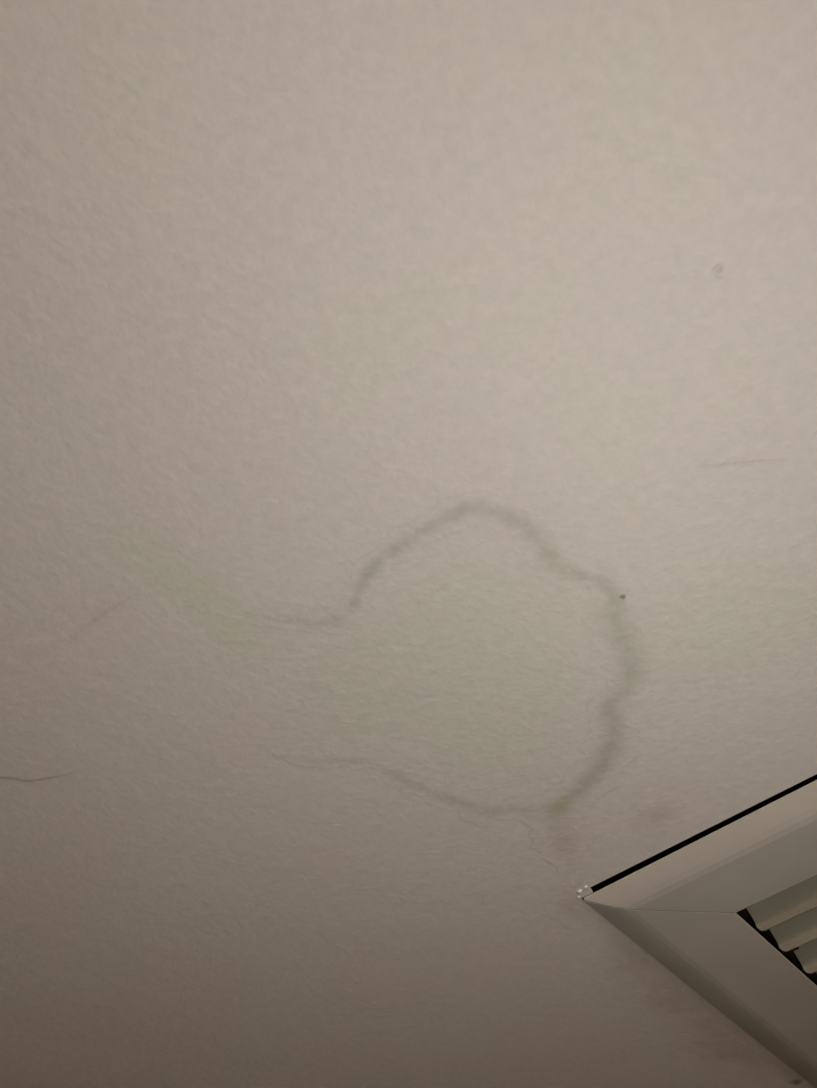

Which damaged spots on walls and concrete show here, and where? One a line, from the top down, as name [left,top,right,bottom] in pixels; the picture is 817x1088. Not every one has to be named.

water stain [52,481,817,1088]